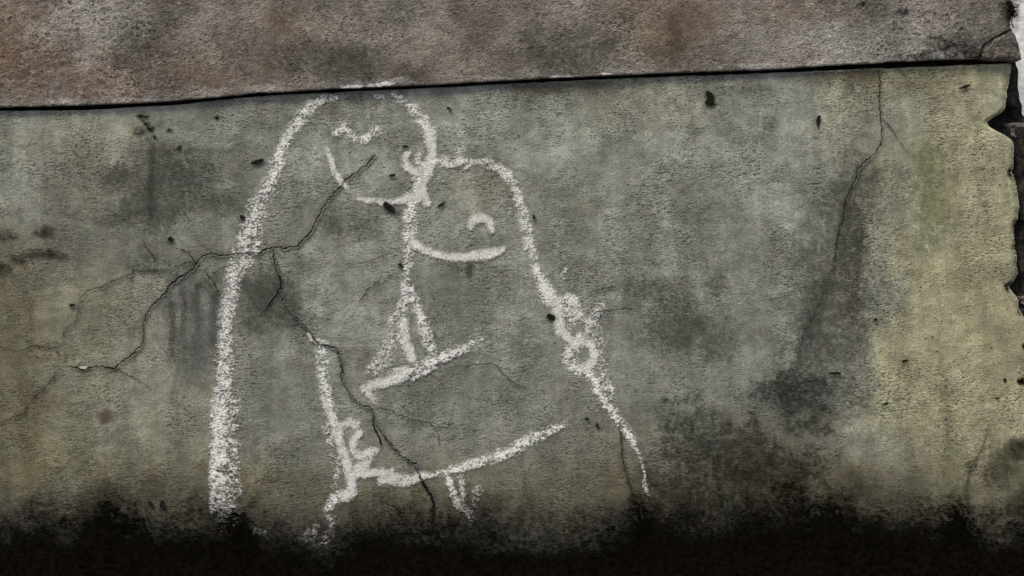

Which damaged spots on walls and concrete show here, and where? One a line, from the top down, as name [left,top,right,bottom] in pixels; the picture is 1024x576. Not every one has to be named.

crack [834,69,909,261]
flaking render [1003,123,1024,137]
crack [0,155,454,527]
water stain [0,370,1024,576]